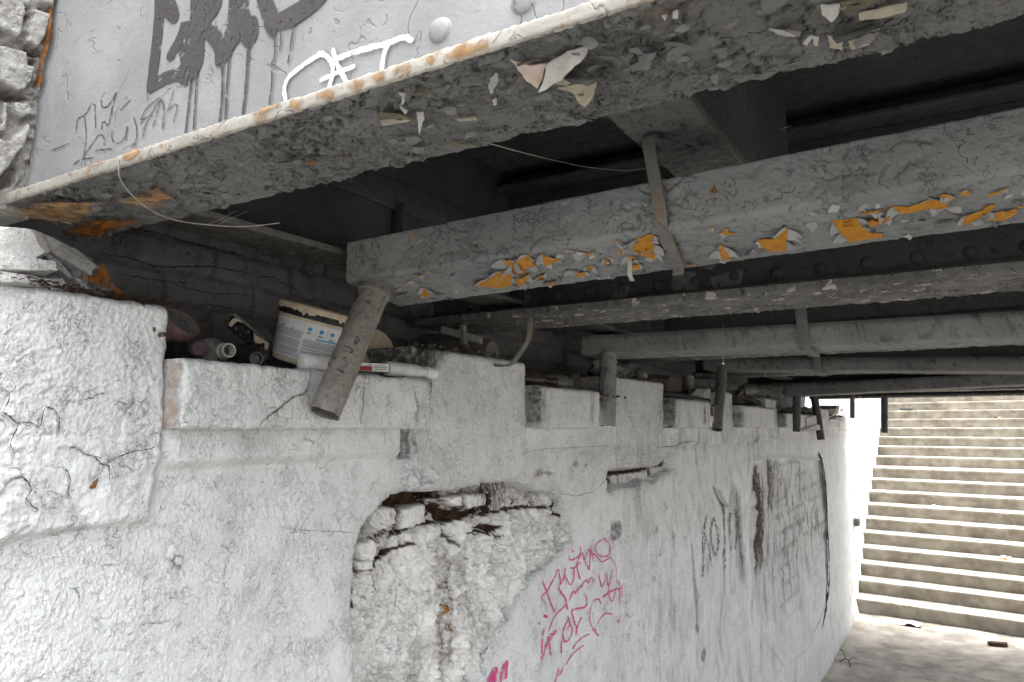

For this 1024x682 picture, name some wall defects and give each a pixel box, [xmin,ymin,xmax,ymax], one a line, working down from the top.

corrosion [353,65,408,89]
peeling [373,10,701,164]
corrosion [15,202,135,237]
corrosion [84,264,125,300]
corrosion [127,189,172,207]
peeling [397,234,665,305]
peeling [670,187,1024,292]
crack [262,380,311,423]
crack [0,384,157,514]
flaking render [606,460,664,484]
crack [818,452,830,629]
flaking render [350,483,572,682]